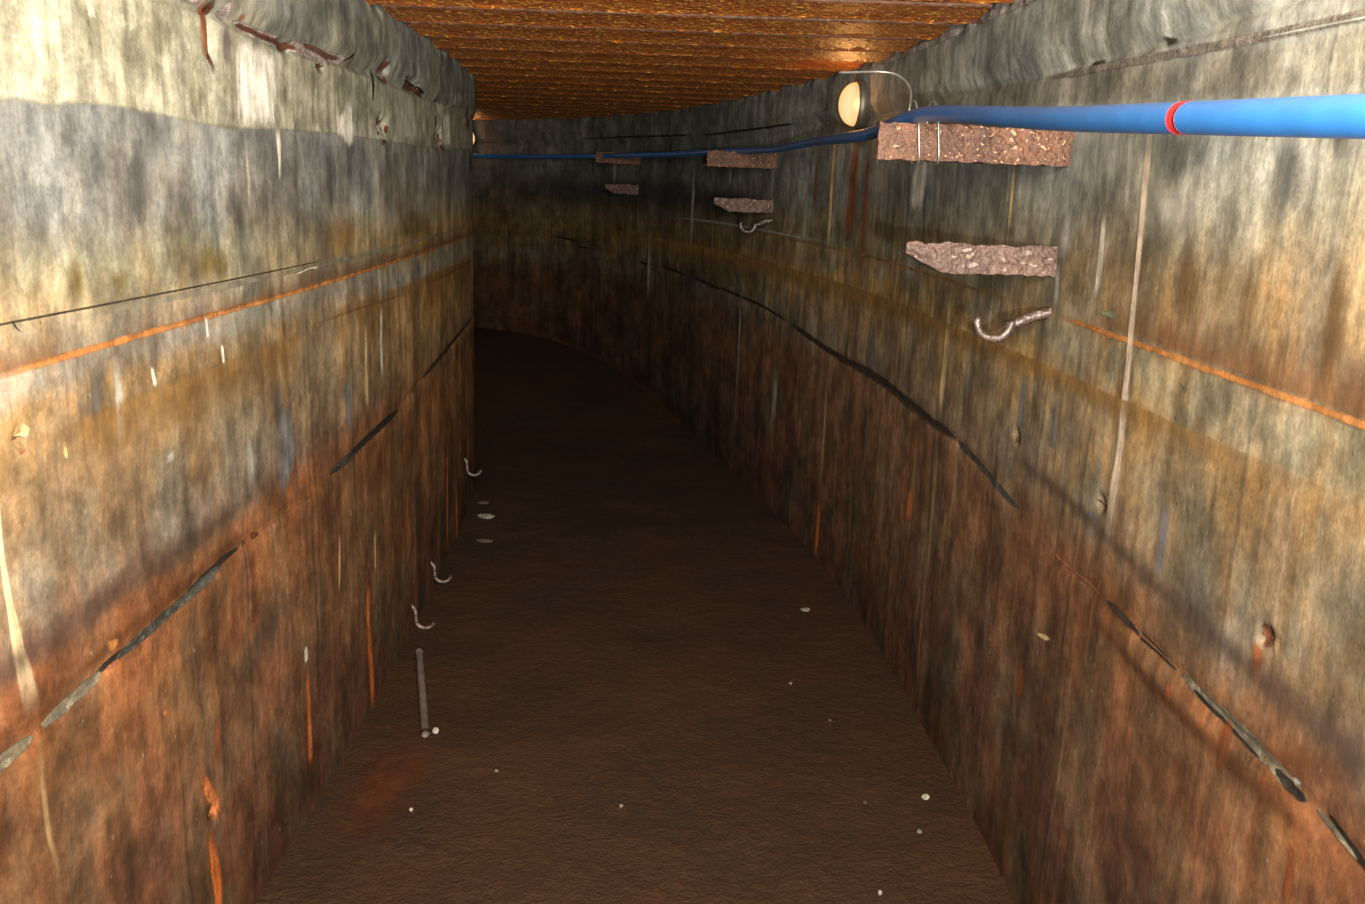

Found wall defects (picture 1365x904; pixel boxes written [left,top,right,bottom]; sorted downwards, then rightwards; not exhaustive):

crack [286,409,398,514]
crack [423,319,471,377]
crack [640,261,1019,508]
water stain [1060,215,1071,249]
water stain [1071,133,1365,503]
crack [0,532,259,771]
crack [1054,553,1365,870]